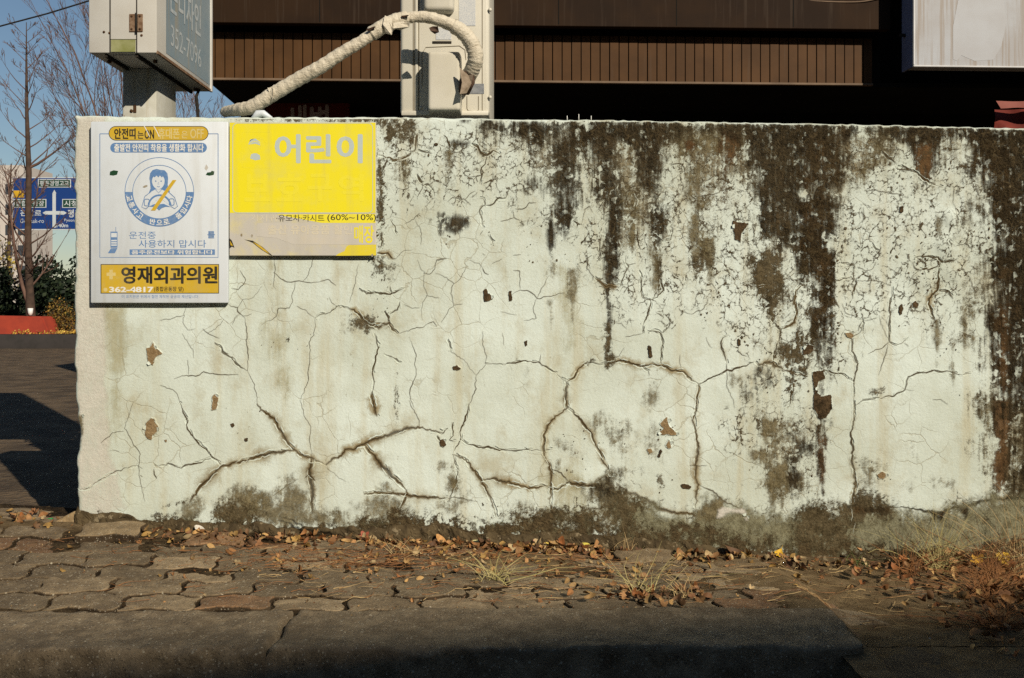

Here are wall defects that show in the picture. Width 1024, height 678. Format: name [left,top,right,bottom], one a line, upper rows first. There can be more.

leakage [438,213,469,234]
peeling [732,220,749,243]
peeling [884,176,943,327]
peeling [146,341,163,366]
crack [78,119,1024,539]
leakage [481,120,1024,504]
peeling [759,309,840,419]
peeling [143,417,167,442]
peeling [646,417,679,458]
leakage [160,477,417,532]
leakage [439,461,464,513]
leakage [510,410,915,554]